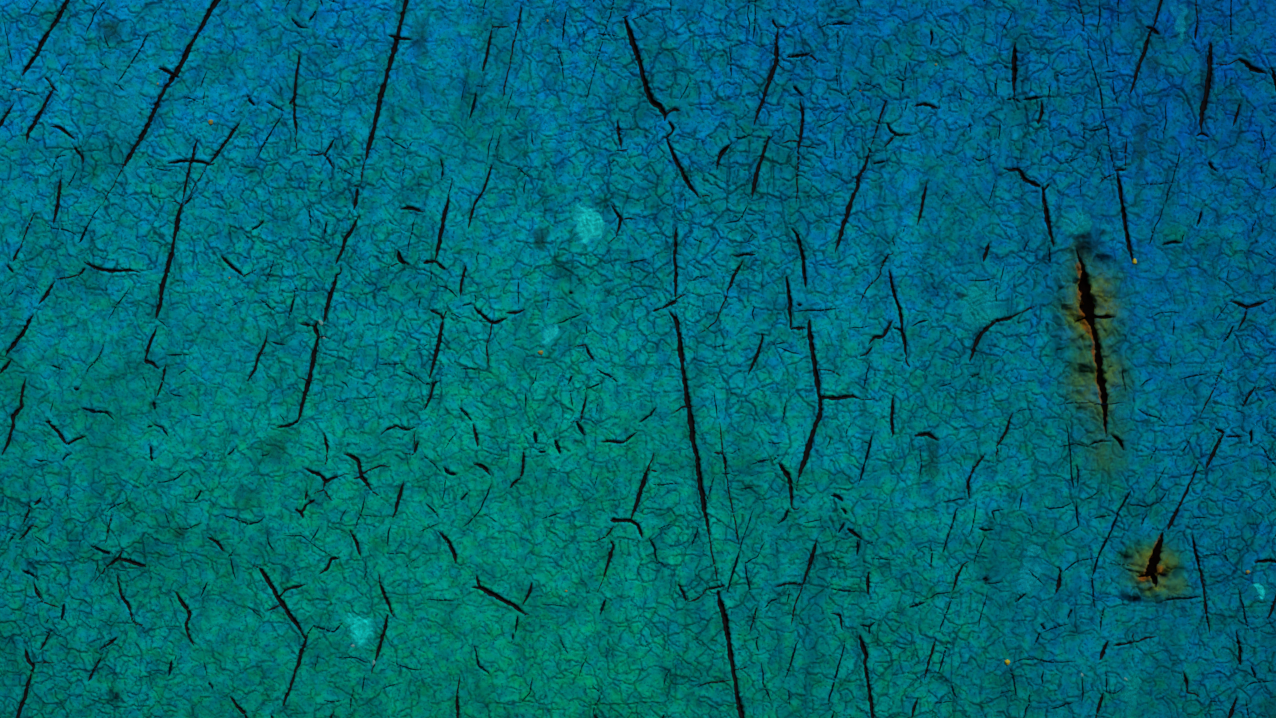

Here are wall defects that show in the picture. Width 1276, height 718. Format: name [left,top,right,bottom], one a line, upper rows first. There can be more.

crack [0,0,412,483]
crack [165,0,971,718]
crack [995,8,1067,125]
rust [1064,266,1121,426]
crack [910,122,1276,718]
crack [1066,0,1276,261]
crack [10,492,69,718]
rust [1129,537,1183,596]